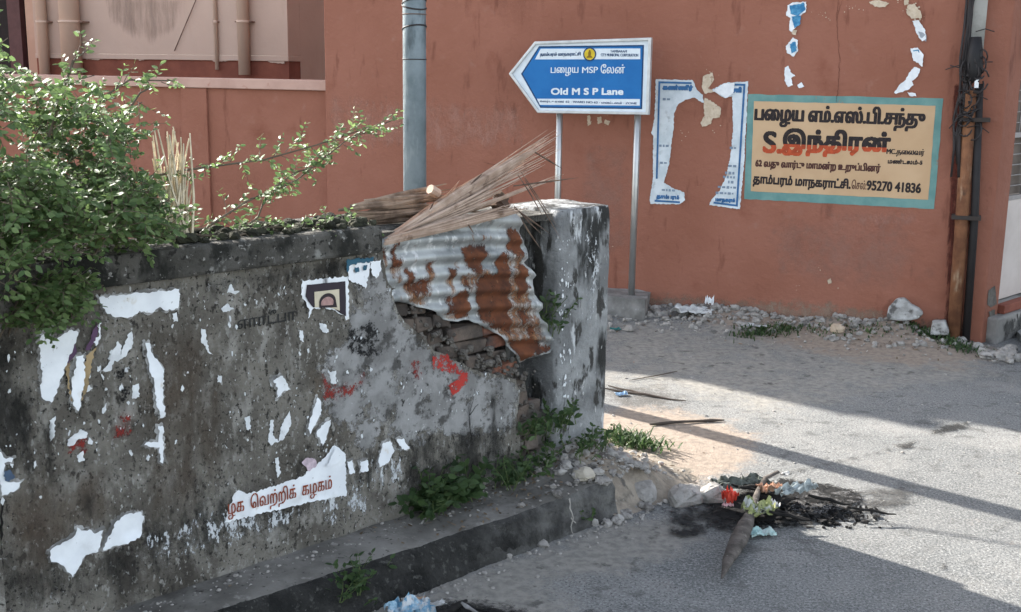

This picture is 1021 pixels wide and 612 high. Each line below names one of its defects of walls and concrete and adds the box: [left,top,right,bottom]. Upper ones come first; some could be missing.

leakage [316,263,345,283]
corrosion [382,242,435,305]
corrosion [444,226,550,361]
leakage [0,344,28,456]
leakage [164,347,198,413]
peeling [307,258,547,525]
leakage [410,399,504,487]
leakage [196,501,226,544]